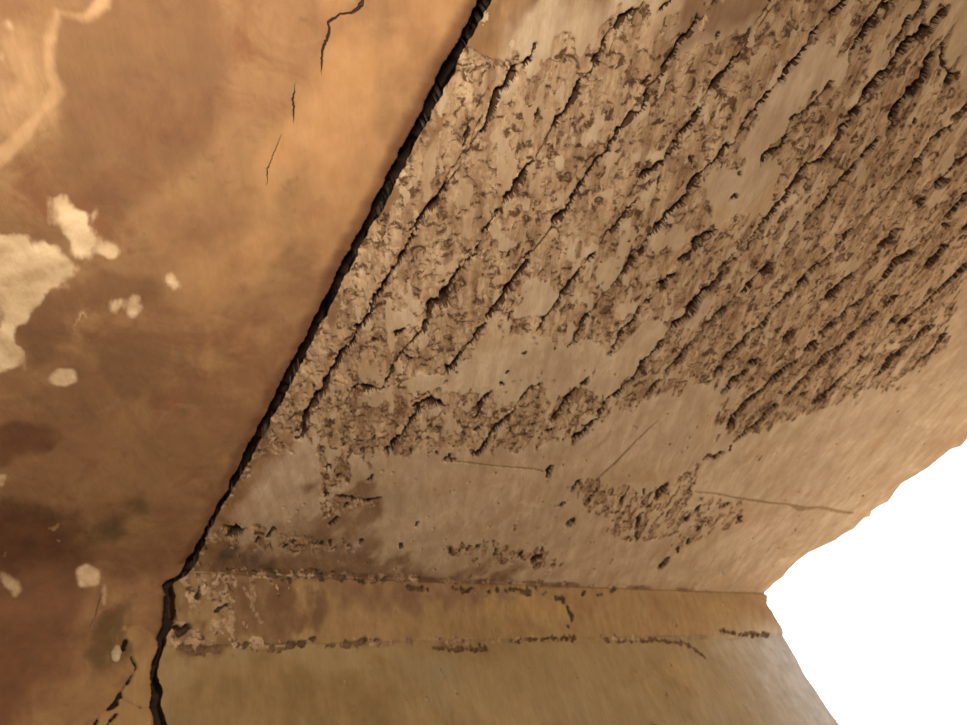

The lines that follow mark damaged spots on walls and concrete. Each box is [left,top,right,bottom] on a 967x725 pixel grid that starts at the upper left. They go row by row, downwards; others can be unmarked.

crack [266,83,296,183]
crack [320,0,364,74]
spalling [458,42,536,160]
leakage [466,0,620,128]
spalling [550,7,703,226]
leakage [651,0,769,73]
spalling [750,0,955,238]
leakage [0,0,477,725]
spalling [294,181,447,439]
spalling [352,160,534,394]
leakage [157,420,840,725]
crack [93,656,161,725]